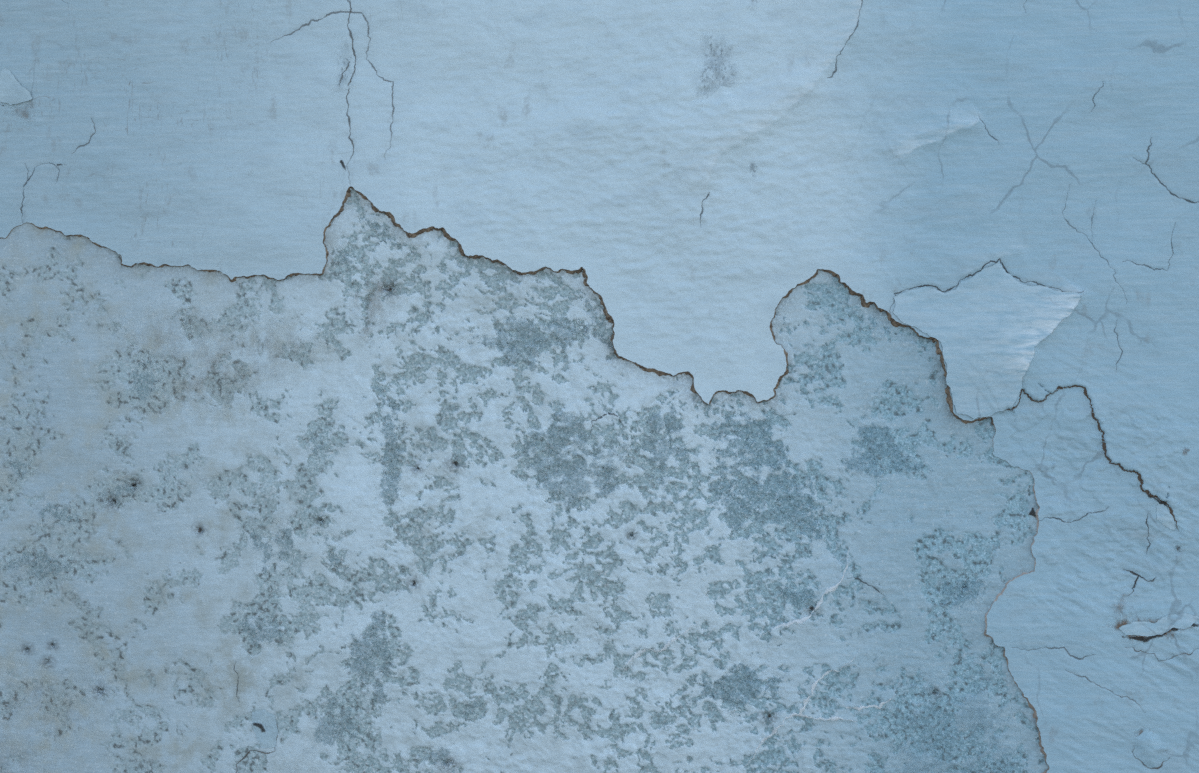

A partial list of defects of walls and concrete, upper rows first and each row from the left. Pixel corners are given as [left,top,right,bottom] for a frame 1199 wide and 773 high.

crack [346,0,356,175]
crack [1135,137,1199,203]
crack [889,258,1081,313]
peeling [0,186,1082,773]